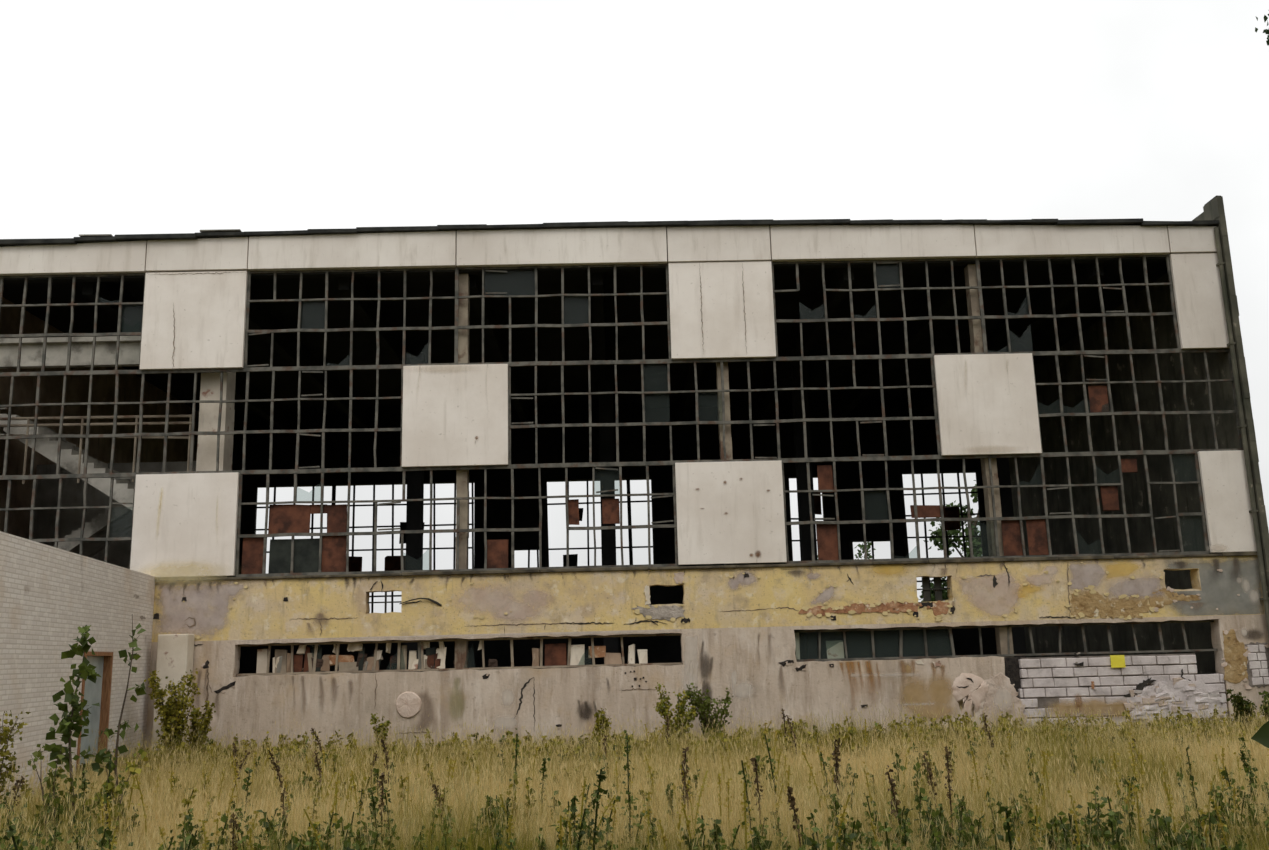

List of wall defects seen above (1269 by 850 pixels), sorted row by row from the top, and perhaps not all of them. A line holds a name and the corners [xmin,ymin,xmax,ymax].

spalling [632,584,690,623]
spalling [799,573,955,621]
peeling [961,559,1269,726]
water stain [389,629,713,710]
crack [513,677,535,726]